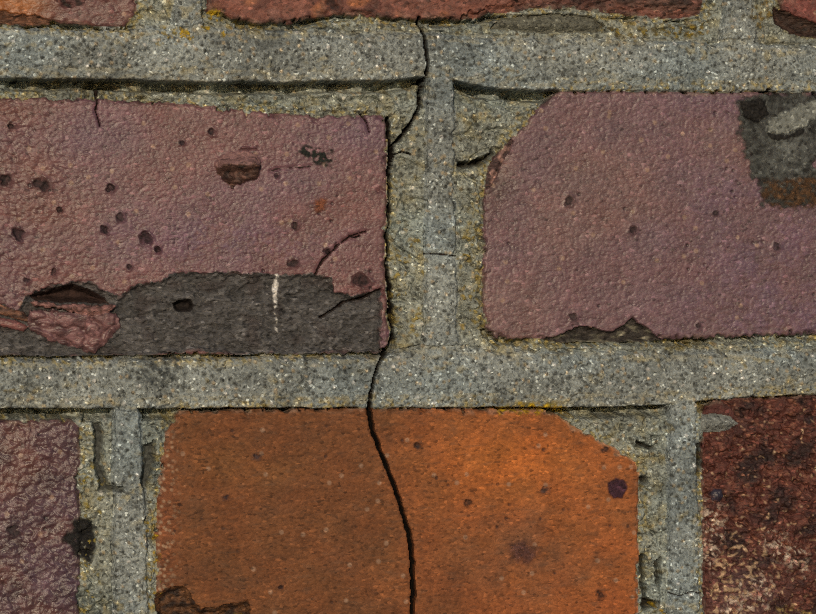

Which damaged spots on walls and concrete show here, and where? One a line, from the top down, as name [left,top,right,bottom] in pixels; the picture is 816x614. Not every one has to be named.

spalling [0,260,383,357]
crack [315,17,430,614]
spalling [544,313,662,344]
spalling [155,586,251,614]